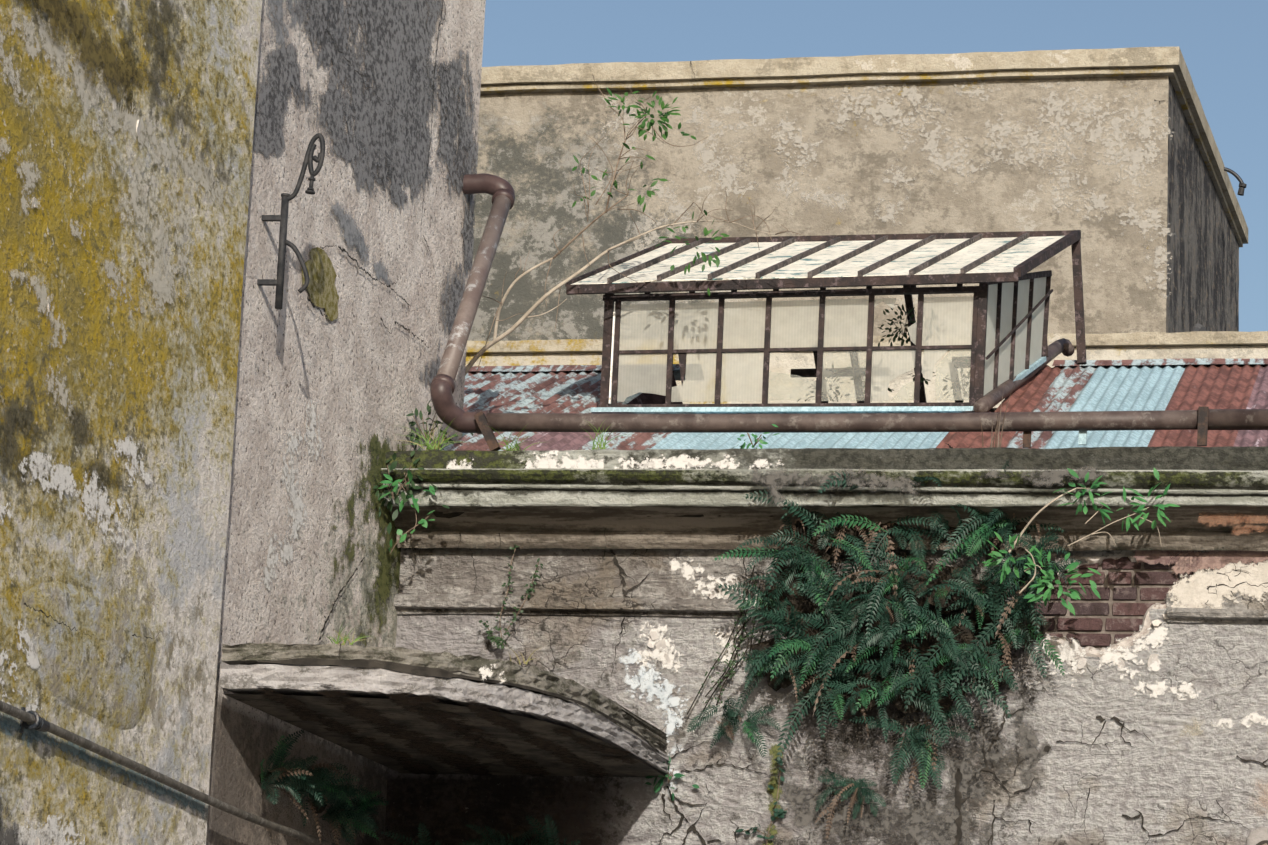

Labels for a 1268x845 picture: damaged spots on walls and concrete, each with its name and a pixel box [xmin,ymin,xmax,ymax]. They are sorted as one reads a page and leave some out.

leakage [26,0,231,182]
peeling [0,8,244,317]
leakage [252,0,480,384]
leakage [446,459,474,469]
leakage [520,450,784,469]
crack [258,558,776,845]
spalling [635,621,683,672]
spalling [670,559,760,609]
crack [953,695,1044,845]
crack [1056,715,1152,752]
spalling [1018,550,1268,660]
crack [1122,800,1248,842]